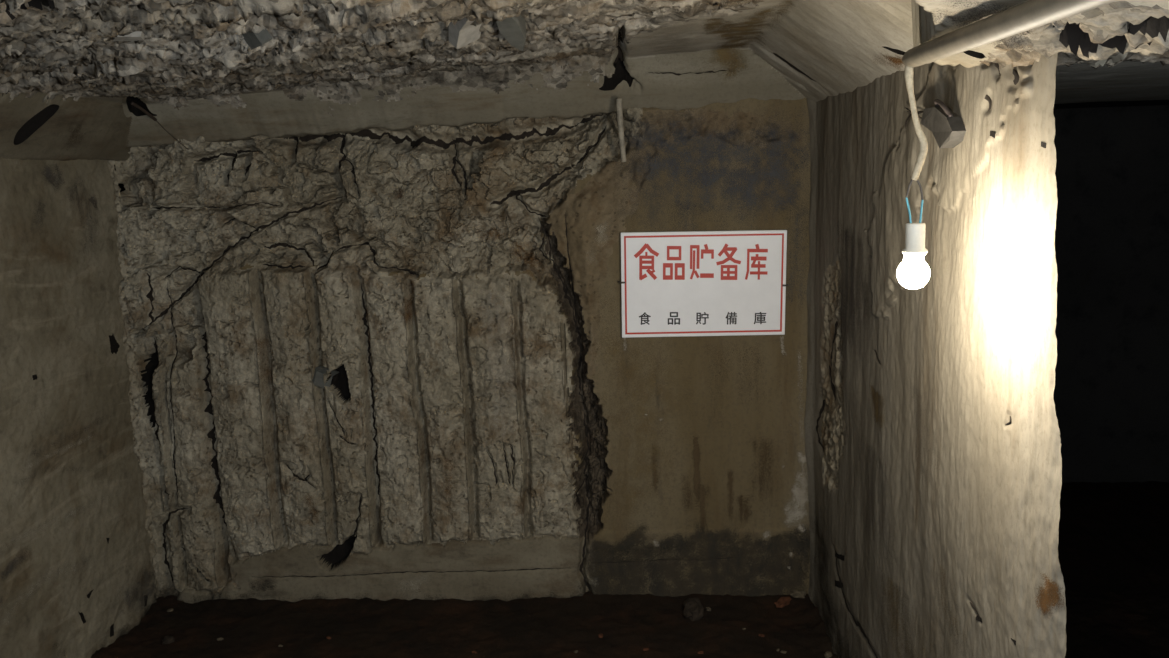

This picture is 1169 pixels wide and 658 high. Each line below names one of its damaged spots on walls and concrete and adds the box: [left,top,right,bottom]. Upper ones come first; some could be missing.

spalling [0,0,764,117]
crack [143,113,606,591]
spalling [108,108,646,607]
damp [473,336,863,658]